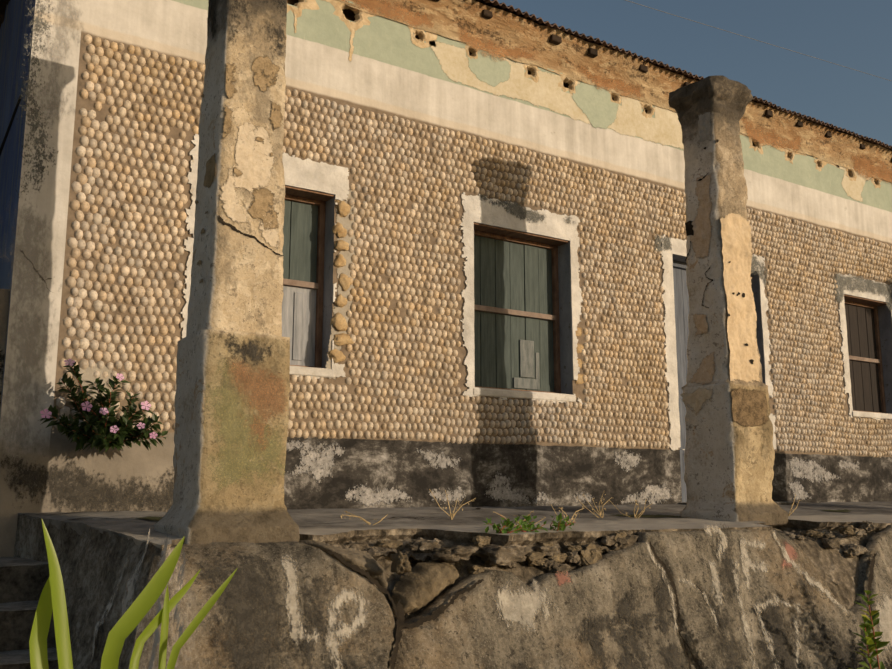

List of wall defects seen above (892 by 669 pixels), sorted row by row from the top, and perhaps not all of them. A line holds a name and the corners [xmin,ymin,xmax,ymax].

water stain [207,0,218,38]
water stain [262,0,287,59]
water stain [18,0,59,195]
flaking render [251,56,280,92]
peeling [407,25,684,151]
flaking render [203,63,283,249]
peeling [764,141,889,202]
crack [218,215,283,256]
flaking render [685,174,712,259]
crack [21,251,53,293]
flaking render [731,388,769,427]
water stain [1,456,175,521]